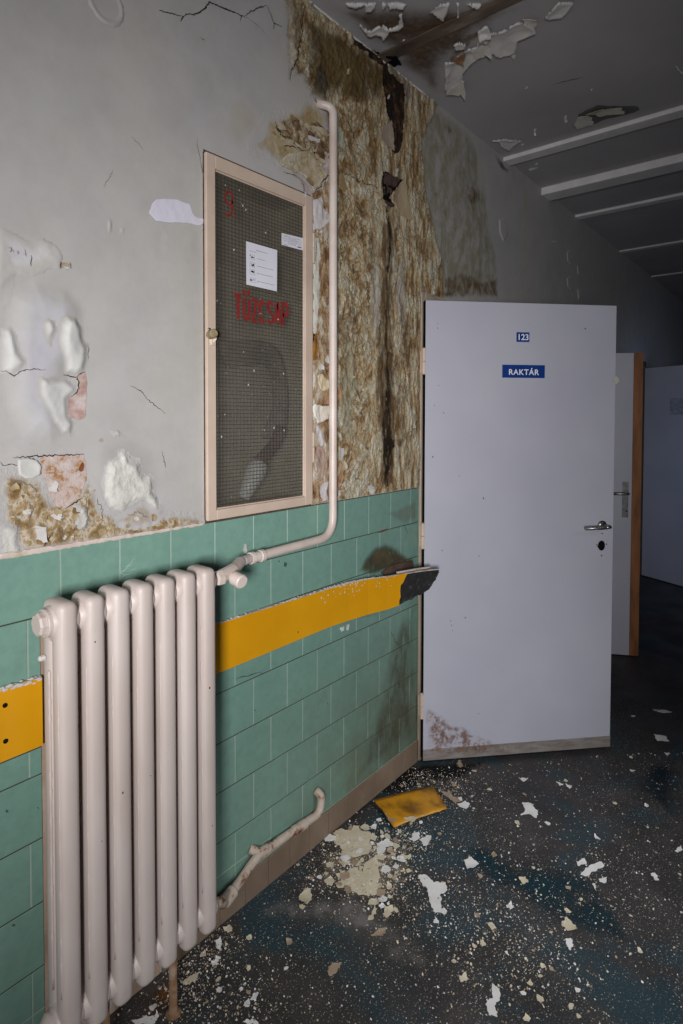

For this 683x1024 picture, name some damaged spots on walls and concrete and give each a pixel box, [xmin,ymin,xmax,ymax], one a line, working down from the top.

crack [159,1,282,40]
leakage [357,14,486,70]
leakage [220,26,382,195]
peeling [564,105,639,129]
leakage [422,105,501,302]
peeling [272,0,574,505]
leakage [373,206,406,487]
flaking render [1,454,87,546]
rust [431,717,486,751]